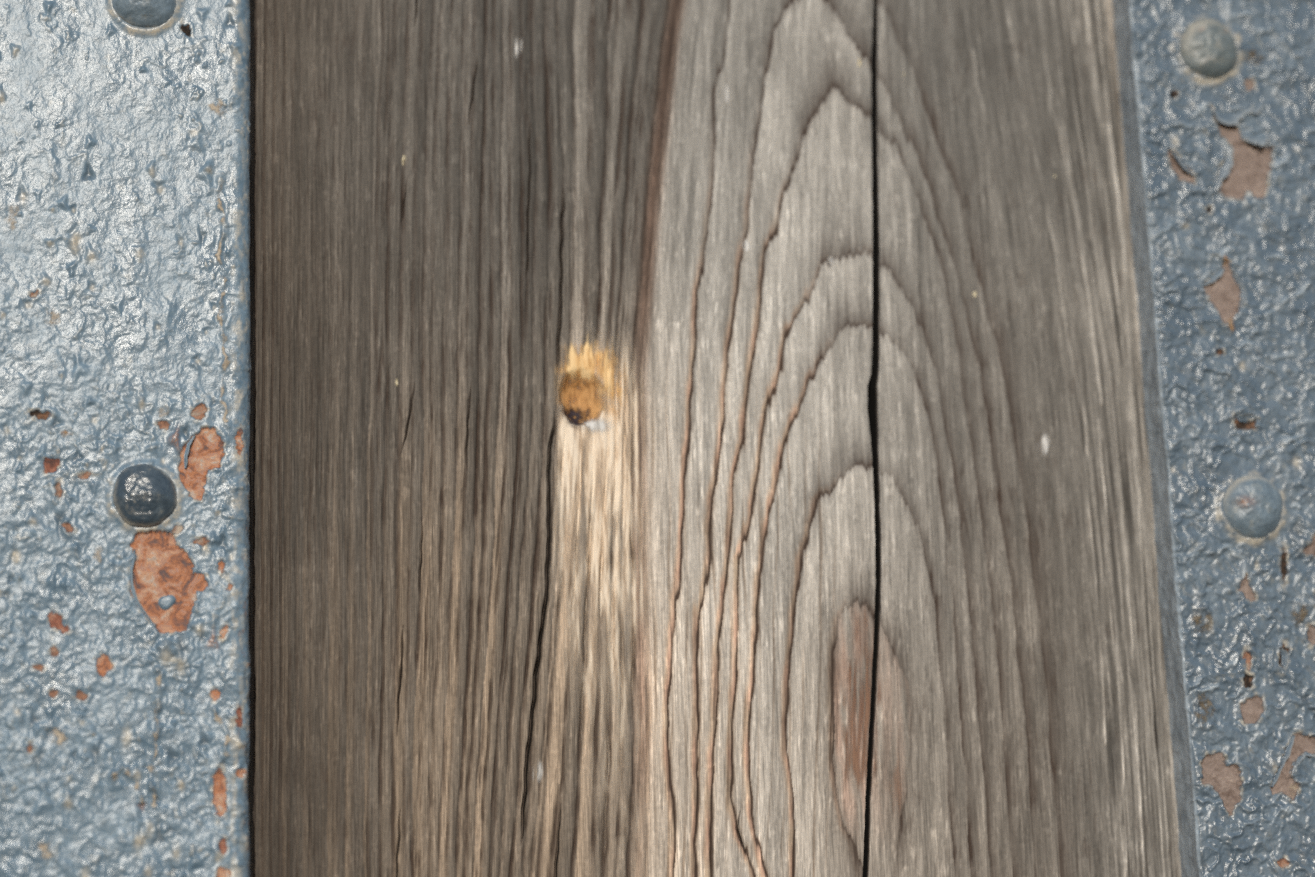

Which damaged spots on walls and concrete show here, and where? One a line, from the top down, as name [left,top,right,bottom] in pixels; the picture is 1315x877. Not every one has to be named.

peeling [1168,145,1198,184]
peeling [1207,79,1274,213]
crack [557,189,565,358]
peeling [1202,260,1247,324]
crack [863,0,880,877]
crack [522,419,555,838]
peeling [1201,752,1242,816]
peeling [1270,733,1315,800]
crack [554,808,562,877]